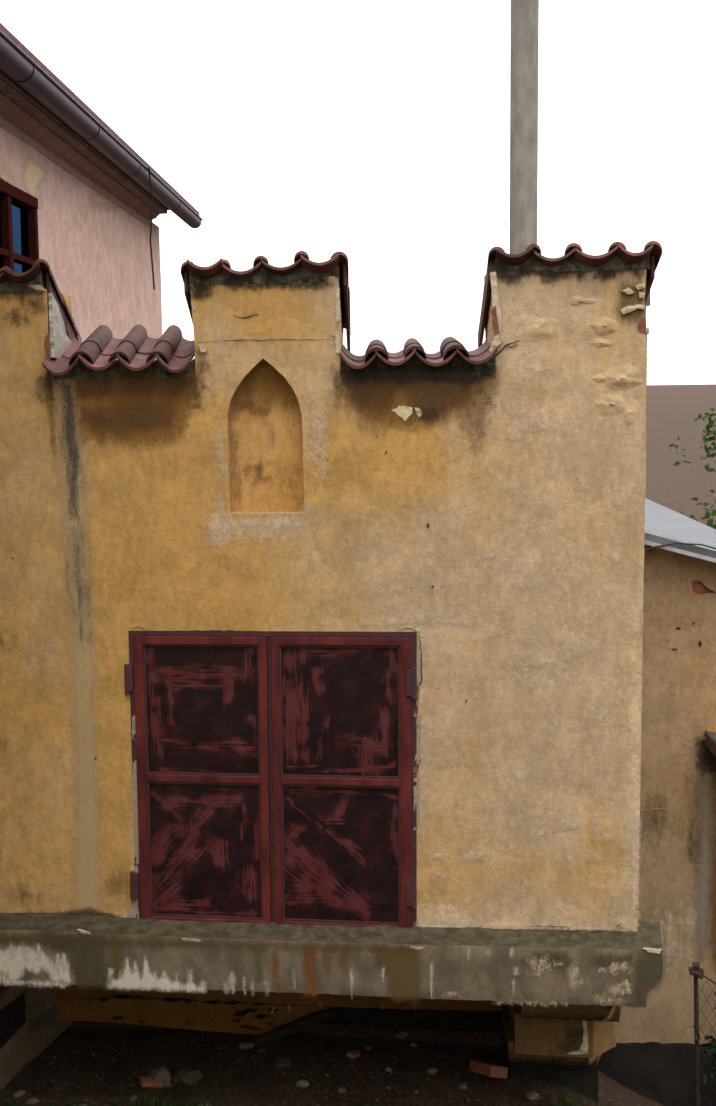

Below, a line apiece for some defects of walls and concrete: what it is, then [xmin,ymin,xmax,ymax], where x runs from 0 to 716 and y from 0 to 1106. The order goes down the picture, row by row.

spalling [620,283,646,332]
peeling [392,405,422,421]
leakage [342,364,495,426]
spalling [692,582,712,594]
leakage [47,373,214,910]
crack [57,994,336,1008]